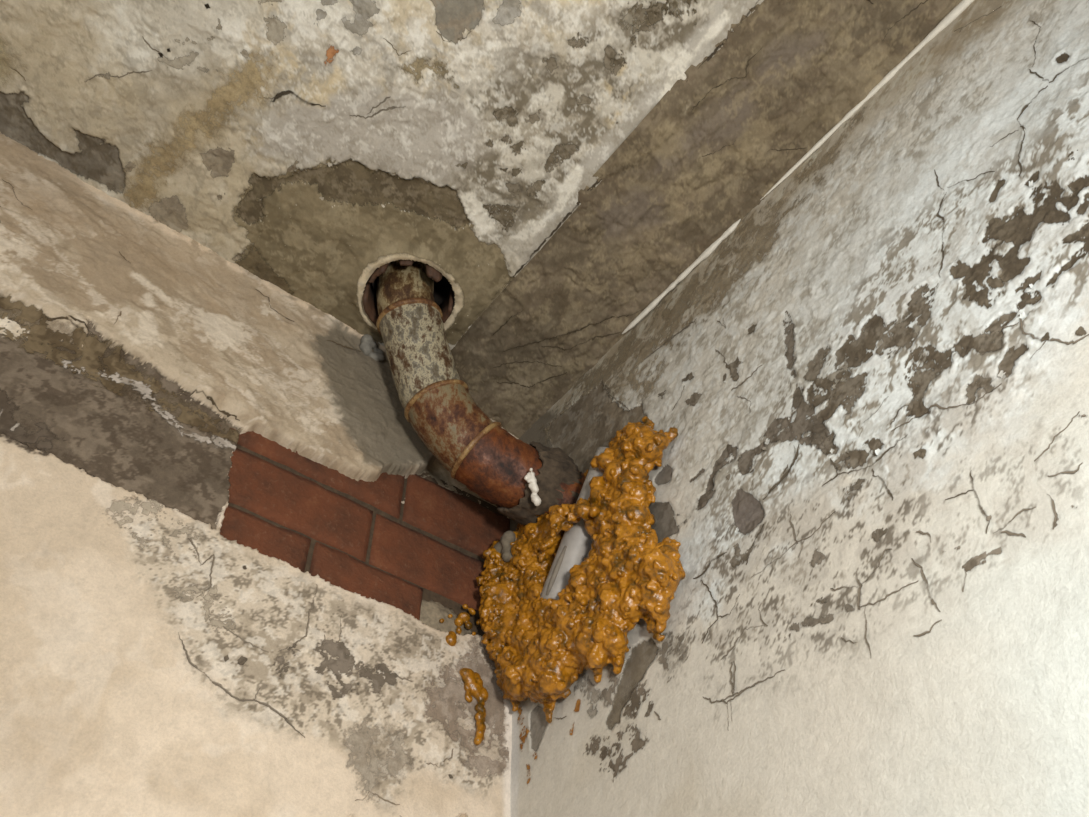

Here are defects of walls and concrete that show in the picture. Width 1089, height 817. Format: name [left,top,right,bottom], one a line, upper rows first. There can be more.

flaking render [431,0,522,44]
flaking render [236,159,470,230]
crack [934,20,1086,277]
peeling [690,170,1089,510]
flaking render [0,317,510,636]
flaking render [730,489,764,567]
crack [693,445,836,727]
crack [830,531,942,654]
crack [822,383,1002,500]
peeling [962,547,1002,572]
crack [945,411,1083,537]
rust [518,706,530,749]